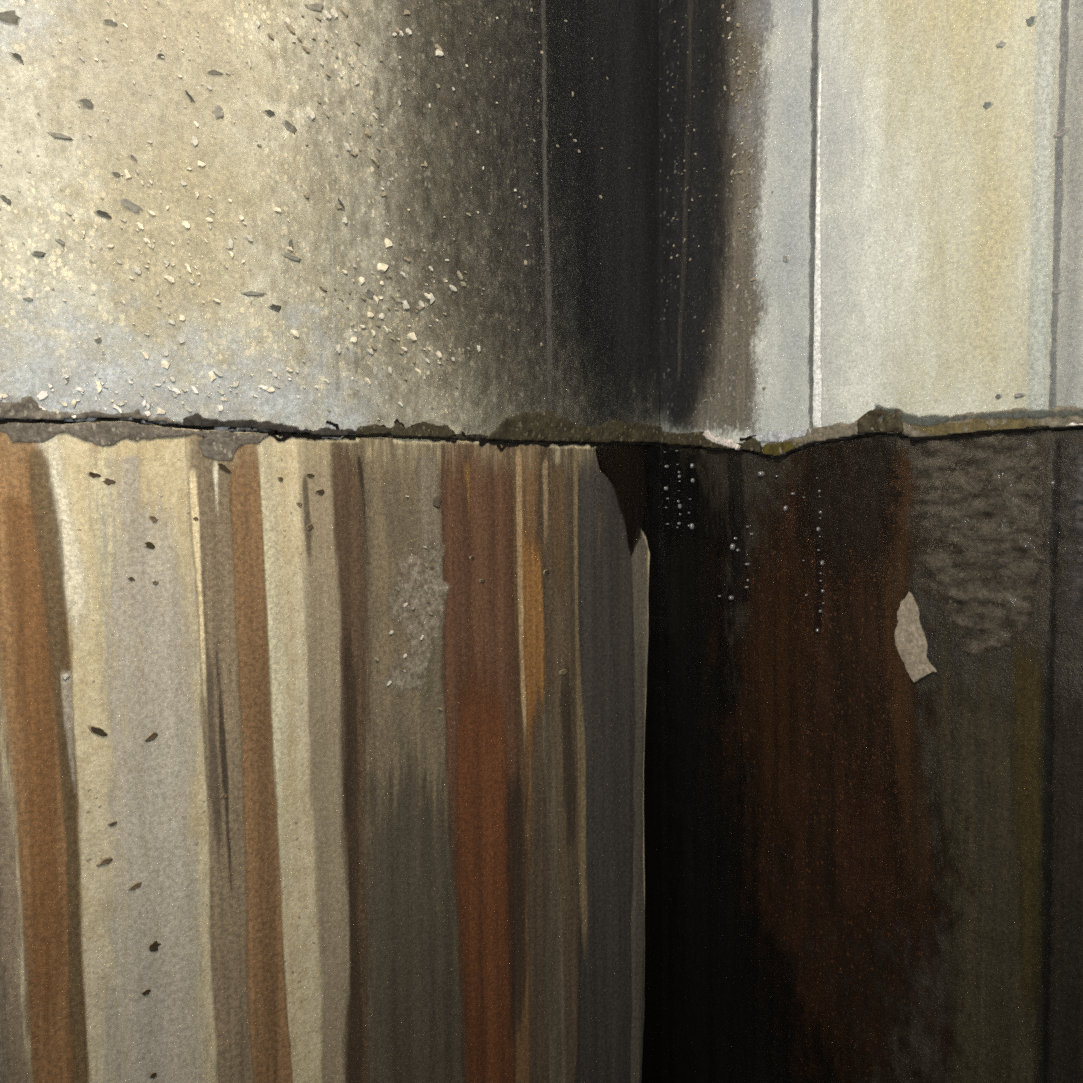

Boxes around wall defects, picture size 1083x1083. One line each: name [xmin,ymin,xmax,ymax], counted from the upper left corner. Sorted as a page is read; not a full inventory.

corrosion [0,431,88,1083]
corrosion [230,443,292,1083]
corrosion [332,441,371,1083]
corrosion [441,443,587,1083]
crack [0,414,1083,462]
water stain [376,0,811,450]
water stain [576,444,855,1083]
corrosion [722,445,952,1083]
water stain [806,437,902,585]
peeling [894,592,937,683]
water stain [940,634,1083,1083]